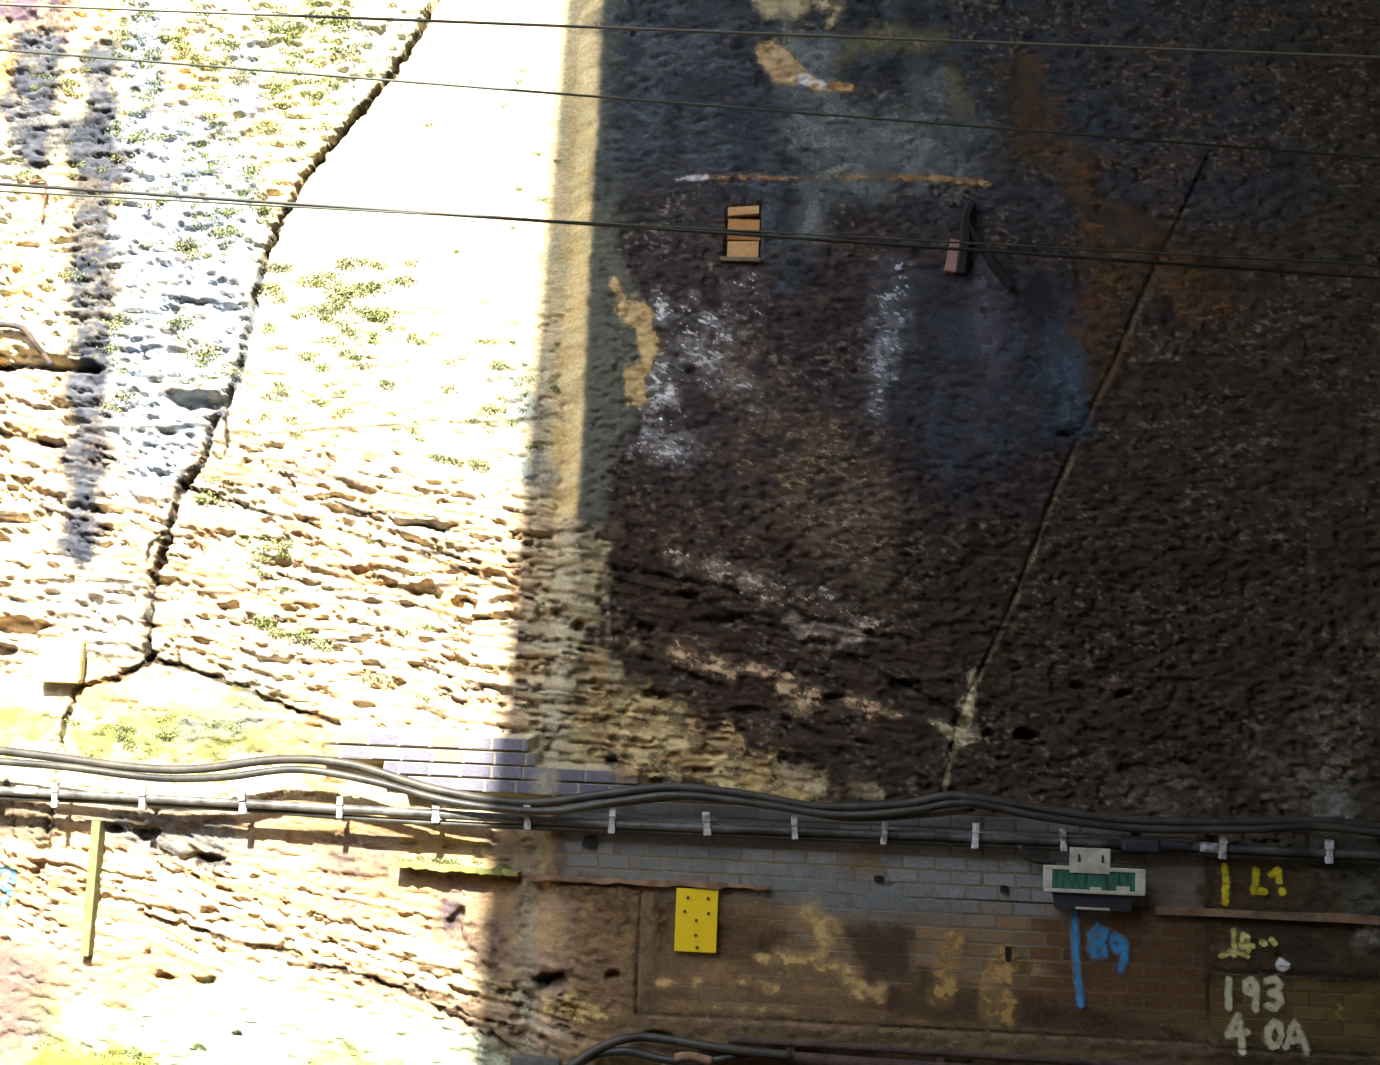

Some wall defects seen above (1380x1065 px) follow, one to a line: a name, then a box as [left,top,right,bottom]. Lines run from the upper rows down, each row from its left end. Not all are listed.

crack [0,362,120,404]
crack [60,7,535,747]
crack [0,431,140,470]
leakage [637,293,920,598]
crack [3,778,15,828]
crack [48,807,57,844]
leakage [204,971,297,1057]
leakage [308,1042,398,1065]